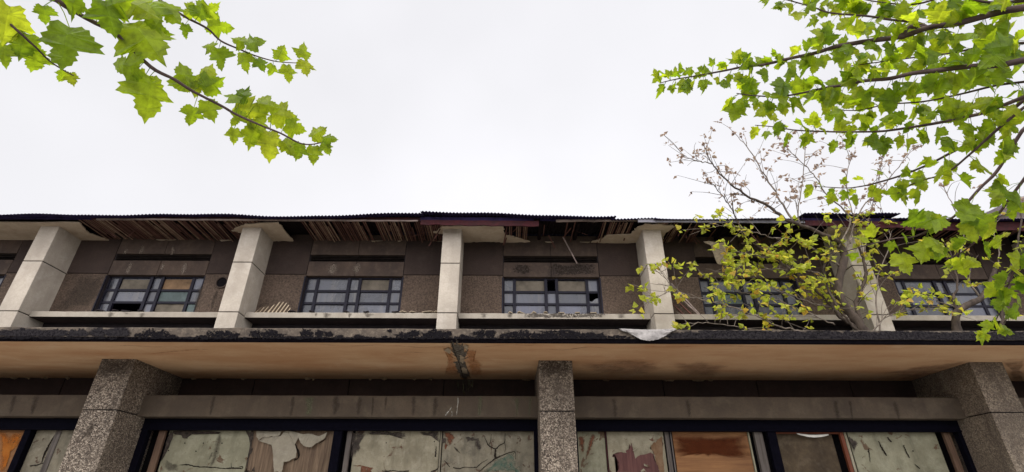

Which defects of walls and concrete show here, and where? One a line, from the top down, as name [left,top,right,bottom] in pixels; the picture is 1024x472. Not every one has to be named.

water stain [0,312,639,340]
water stain [665,330,1024,340]
spalling [444,341,470,379]